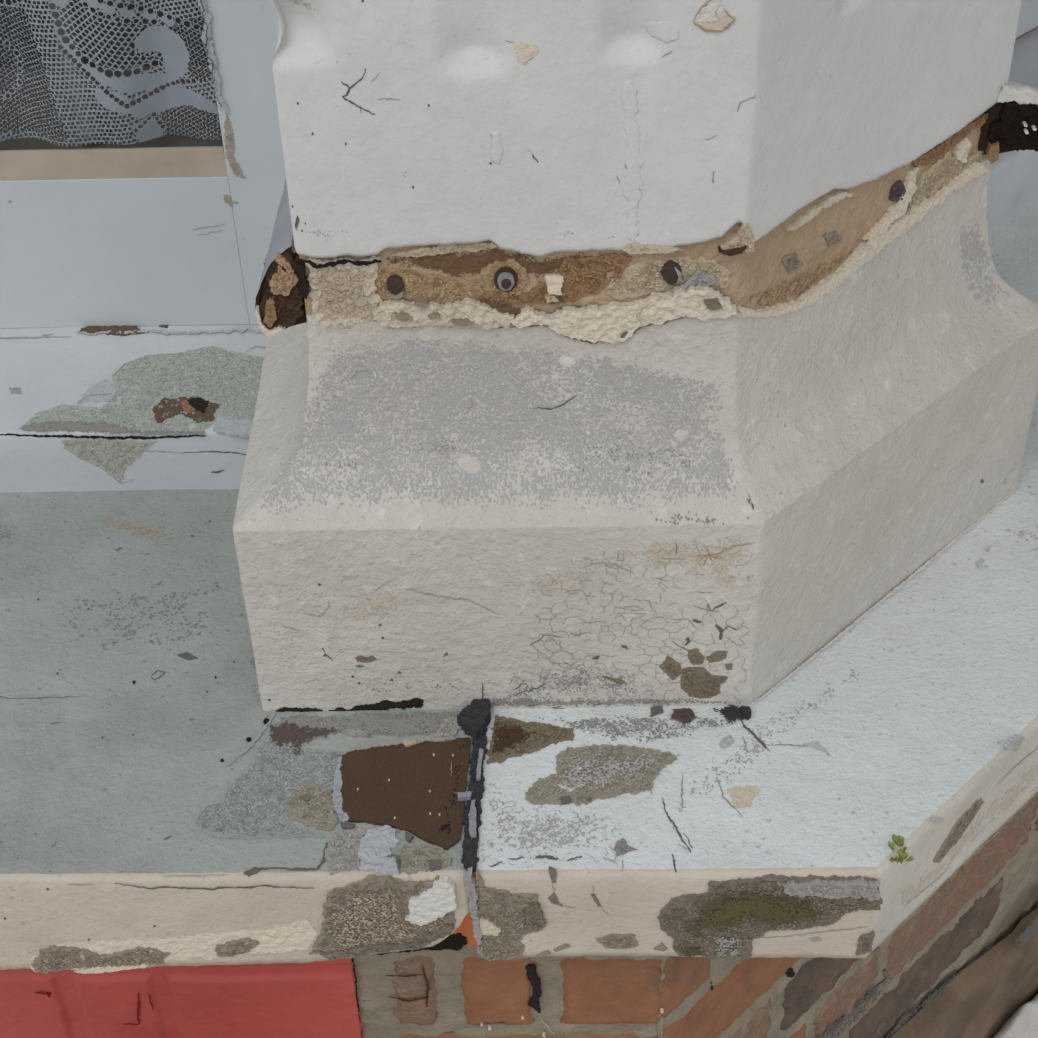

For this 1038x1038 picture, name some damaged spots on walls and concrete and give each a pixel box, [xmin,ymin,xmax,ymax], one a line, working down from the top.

crack [341,69,398,115]
spalling [305,113,989,344]
corrosion [477,253,632,316]
peeling [20,346,264,483]
crack [0,433,246,484]
crack [481,542,830,756]
spalling [659,648,733,699]
crack [0,696,80,724]
spalling [487,715,574,764]
peeling [30,716,471,974]
spalling [614,839,638,857]
spalling [654,874,883,960]